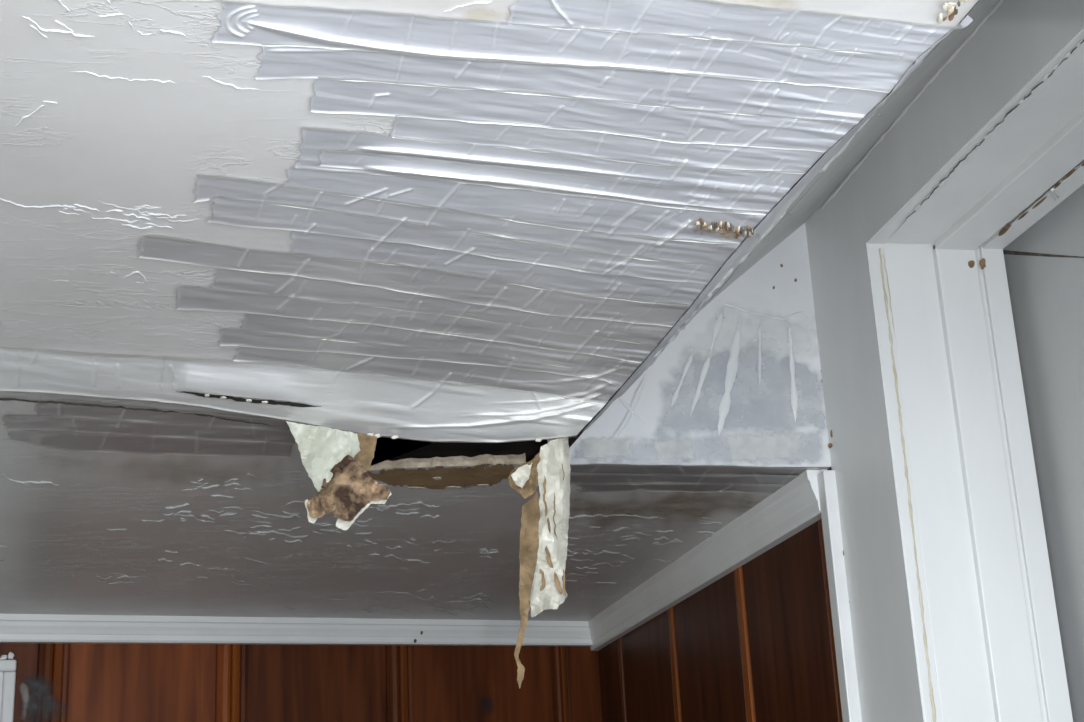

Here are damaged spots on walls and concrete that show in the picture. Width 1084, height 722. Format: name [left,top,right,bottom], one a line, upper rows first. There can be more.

leakage [694,226,740,238]
peeling [0,472,59,486]
peeling [141,421,461,563]
peeling [388,431,684,689]